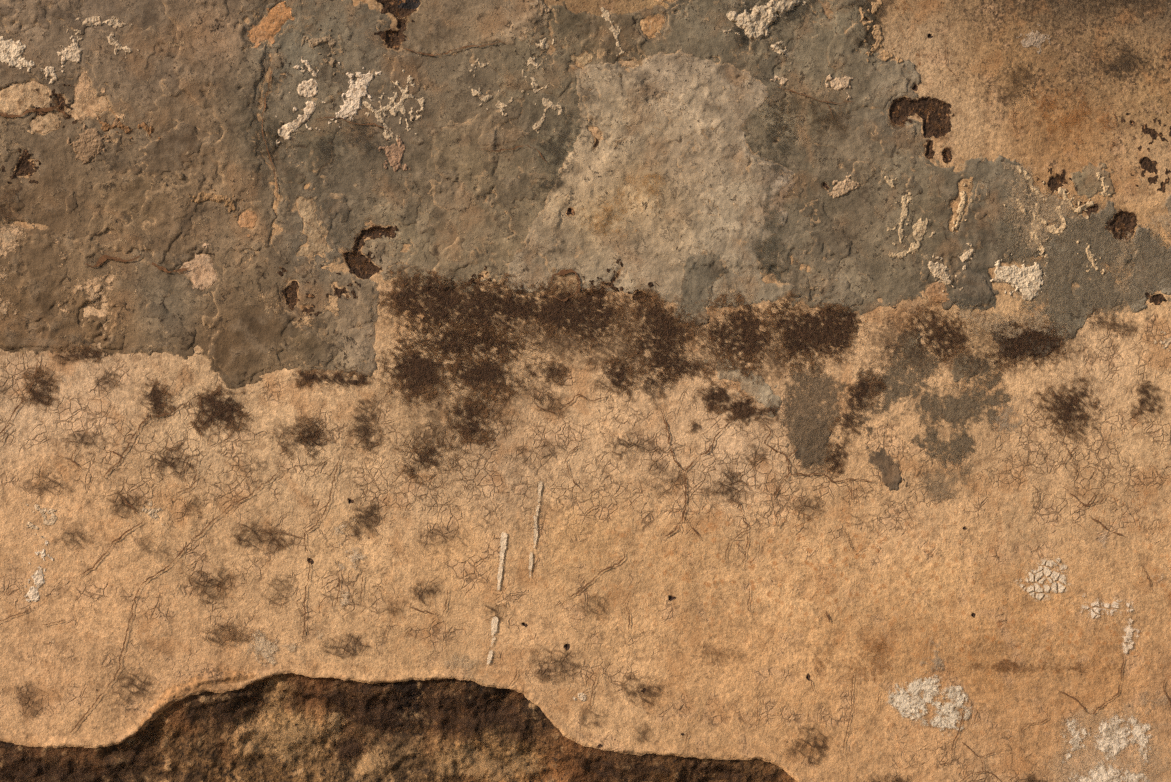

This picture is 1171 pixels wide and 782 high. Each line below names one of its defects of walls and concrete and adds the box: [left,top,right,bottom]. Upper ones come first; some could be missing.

peeling [0,0,160,282]
peeling [145,0,525,385]
peeling [754,0,1111,321]
damp [292,188,861,485]
crack [57,397,279,736]
crack [258,437,616,642]
crack [646,408,906,618]
damp [1016,558,1067,600]
flaking render [0,658,816,782]
damp [888,642,971,735]
crack [940,654,1124,782]
damp [1062,716,1151,782]